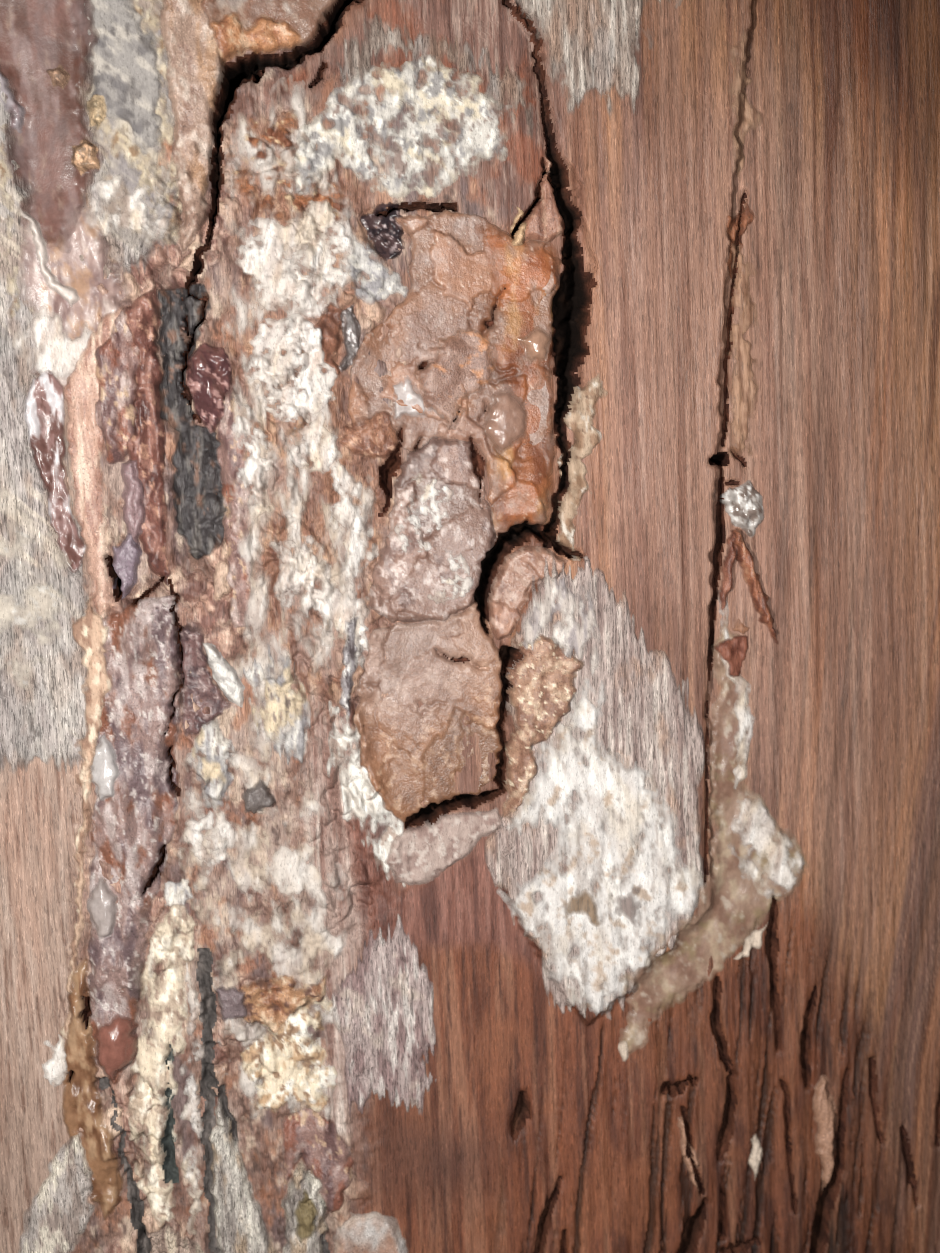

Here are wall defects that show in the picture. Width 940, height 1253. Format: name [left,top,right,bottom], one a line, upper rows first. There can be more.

crack [180,0,364,423]
crack [377,202,458,217]
spalling [25,371,85,571]
peeling [105,461,145,602]
spalling [378,428,421,517]
crack [405,0,597,829]
crack [703,193,747,882]
damp [715,619,753,782]
peeling [243,781,275,813]
peeling [283,1108,408,1253]